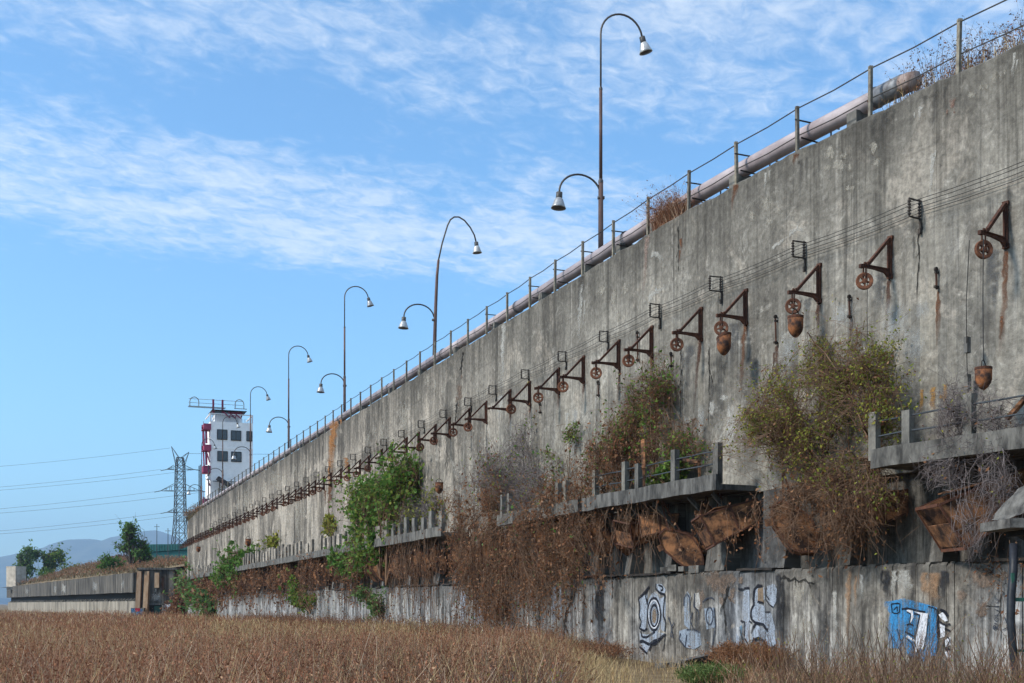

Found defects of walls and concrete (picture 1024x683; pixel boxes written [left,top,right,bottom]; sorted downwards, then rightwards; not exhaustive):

rust [1000,250,1008,328]
rust [324,419,342,503]
crack [781,575,814,587]